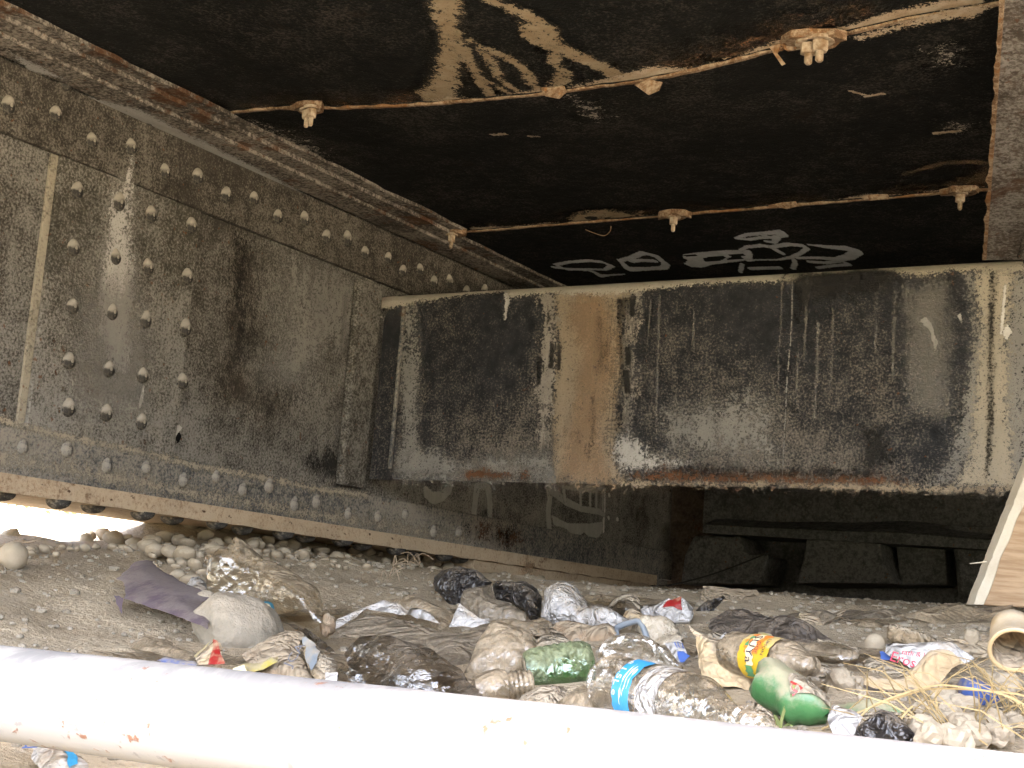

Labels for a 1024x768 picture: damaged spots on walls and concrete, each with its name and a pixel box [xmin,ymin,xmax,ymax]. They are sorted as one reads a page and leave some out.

water stain [374,260,1024,496]
corrosion [545,286,1013,499]